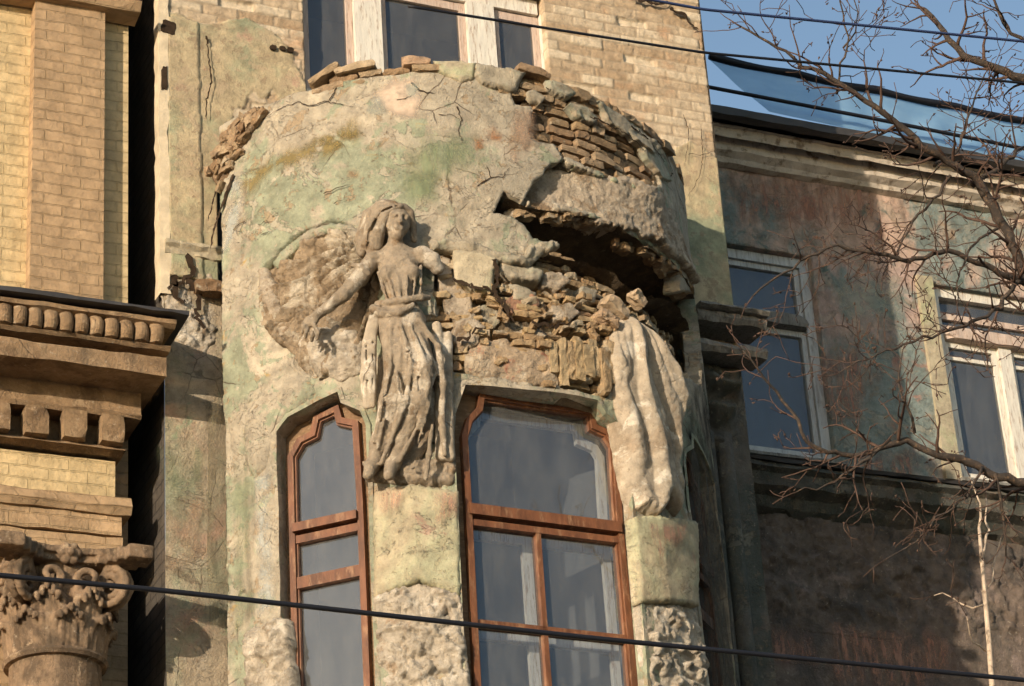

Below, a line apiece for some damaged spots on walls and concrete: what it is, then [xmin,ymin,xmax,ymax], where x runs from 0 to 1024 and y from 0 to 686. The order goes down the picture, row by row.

crack [205,36,213,117]
spalling [204,106,269,194]
crack [397,82,462,140]
spalling [433,60,672,186]
spalling [430,199,694,335]